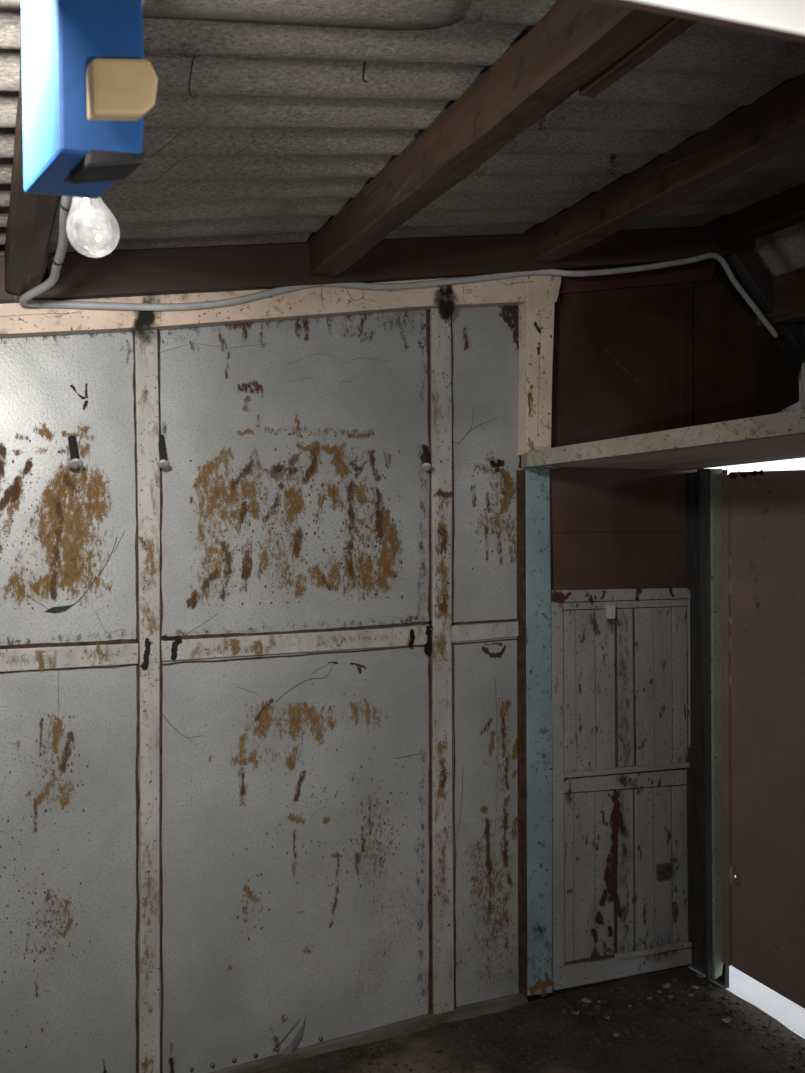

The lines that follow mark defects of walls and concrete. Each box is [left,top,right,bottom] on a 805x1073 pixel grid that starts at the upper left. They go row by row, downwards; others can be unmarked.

rust [0,424,112,609]
rust [186,414,402,609]
rust [0,714,91,996]
rust [230,683,408,941]
rust [463,451,554,997]